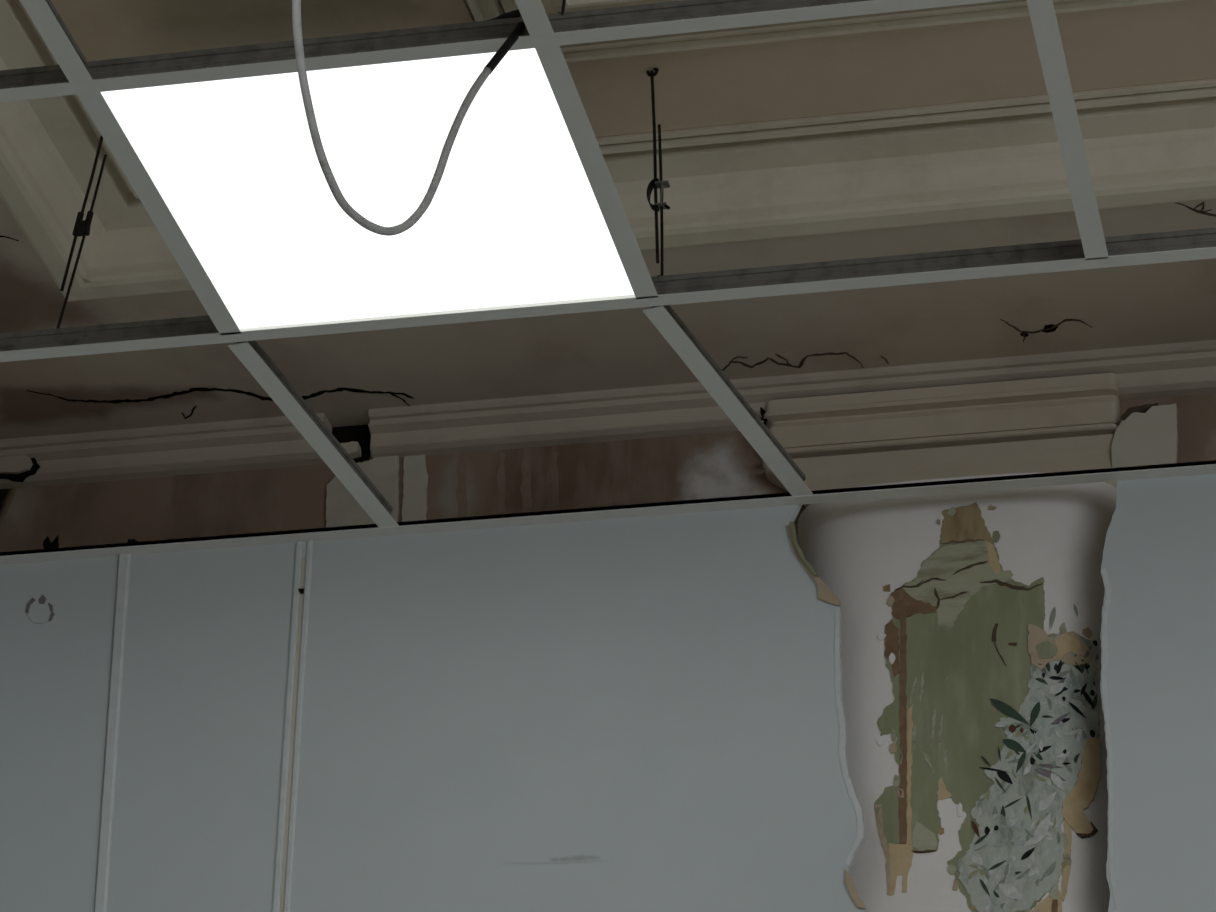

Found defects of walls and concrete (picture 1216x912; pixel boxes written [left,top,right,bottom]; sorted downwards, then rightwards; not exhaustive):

crack [1176,202,1216,217]
crack [1000,319,1092,342]
crack [721,352,889,371]
crack [27,388,273,419]
crack [302,388,414,407]
peeling [874,502,1092,912]